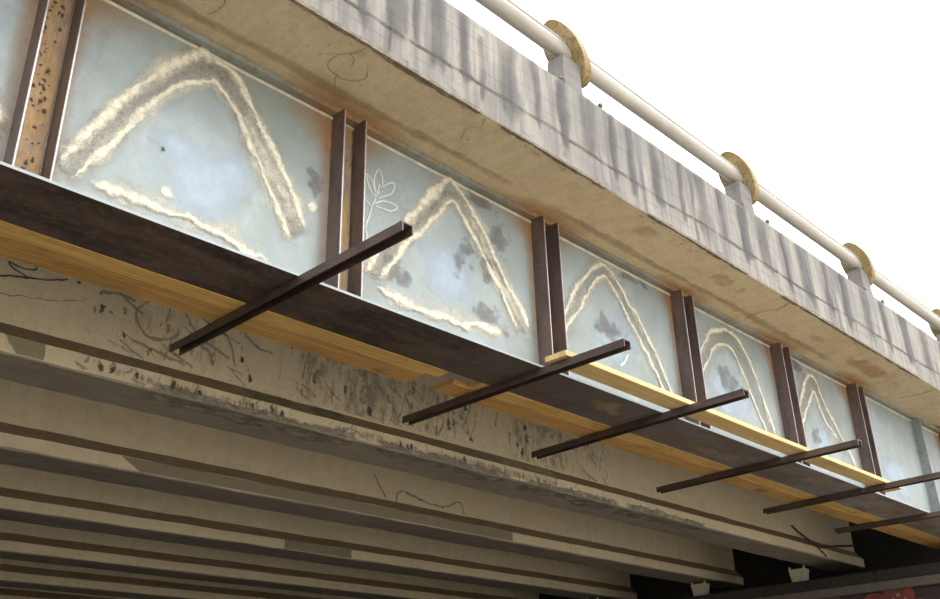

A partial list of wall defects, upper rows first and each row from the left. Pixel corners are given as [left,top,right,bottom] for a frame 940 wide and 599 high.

damp [434,0,445,31]
rust [14,0,103,175]
crack [318,48,368,88]
damp [531,58,541,121]
damp [558,77,569,145]
damp [610,113,637,191]
crack [347,0,940,398]
damp [652,147,664,203]
spalling [76,347,704,529]